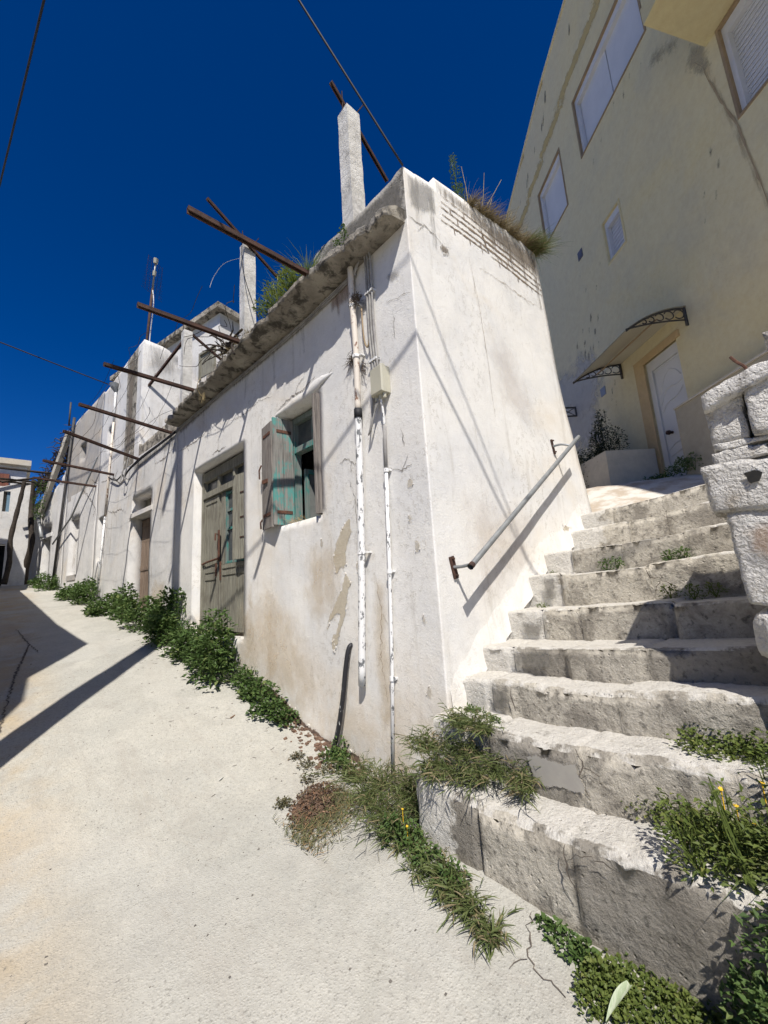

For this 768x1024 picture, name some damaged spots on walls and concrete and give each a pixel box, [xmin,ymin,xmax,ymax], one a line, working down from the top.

peeling [328,519,358,653]
crack [510,913,566,998]